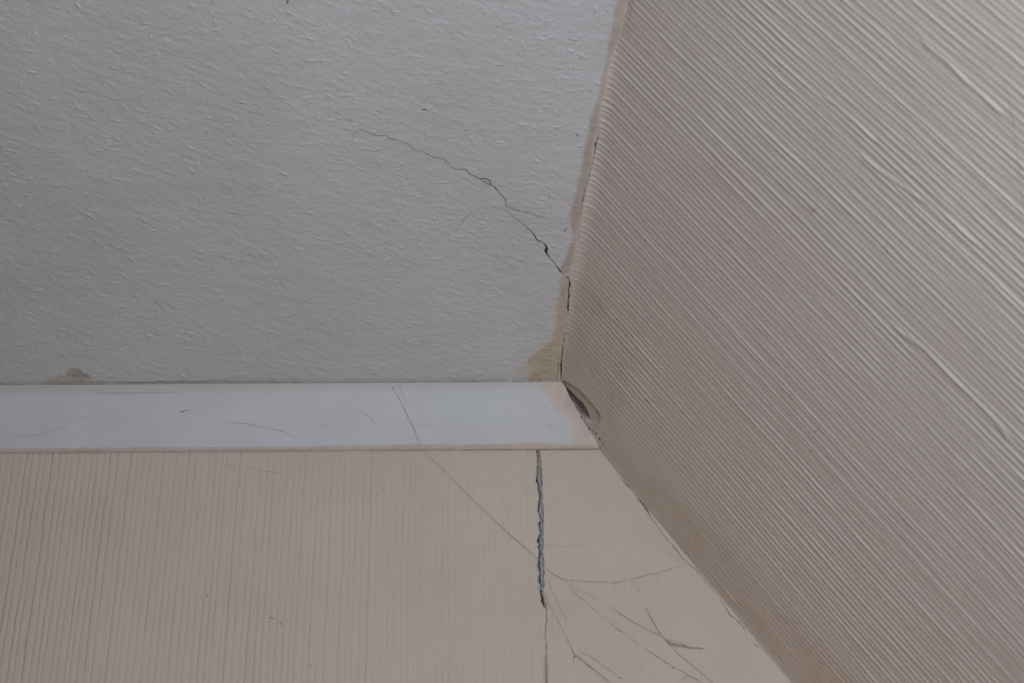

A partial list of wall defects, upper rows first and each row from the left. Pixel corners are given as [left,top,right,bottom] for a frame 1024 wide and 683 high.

crack [414,149,571,382]
crack [526,449,597,682]
crack [623,481,697,571]